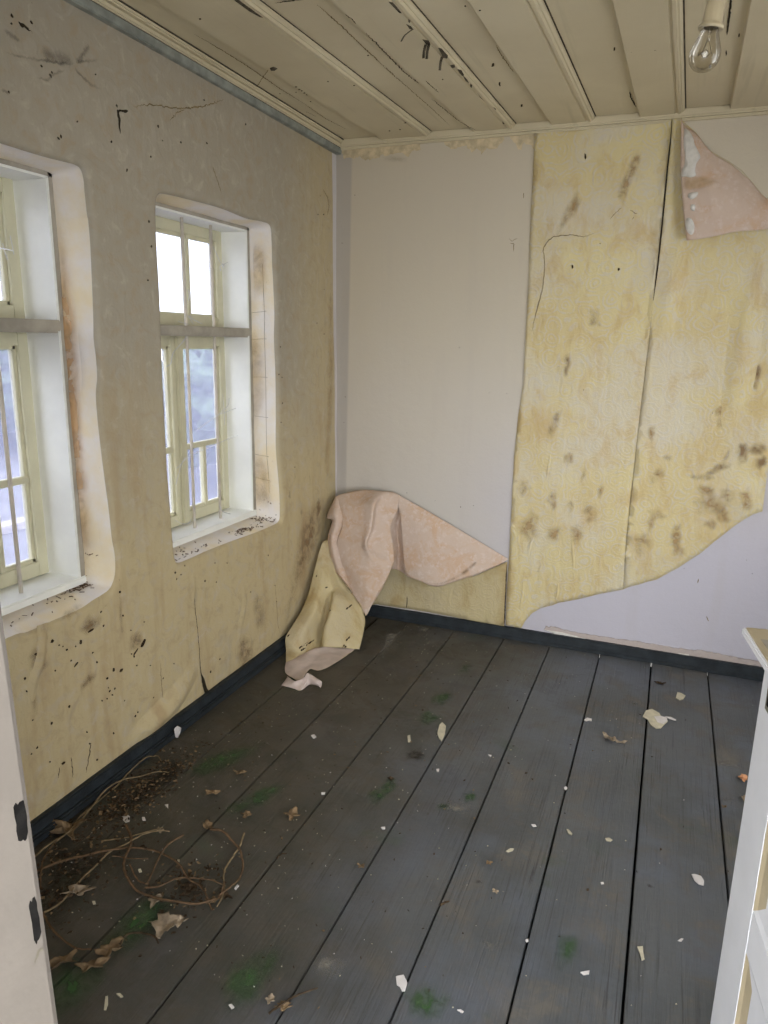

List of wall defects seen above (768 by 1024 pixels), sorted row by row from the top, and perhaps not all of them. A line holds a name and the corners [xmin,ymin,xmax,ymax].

crack [137,100,221,120]
peeling [680,118,768,241]
crack [532,208,637,329]
water stain [740,446,765,466]